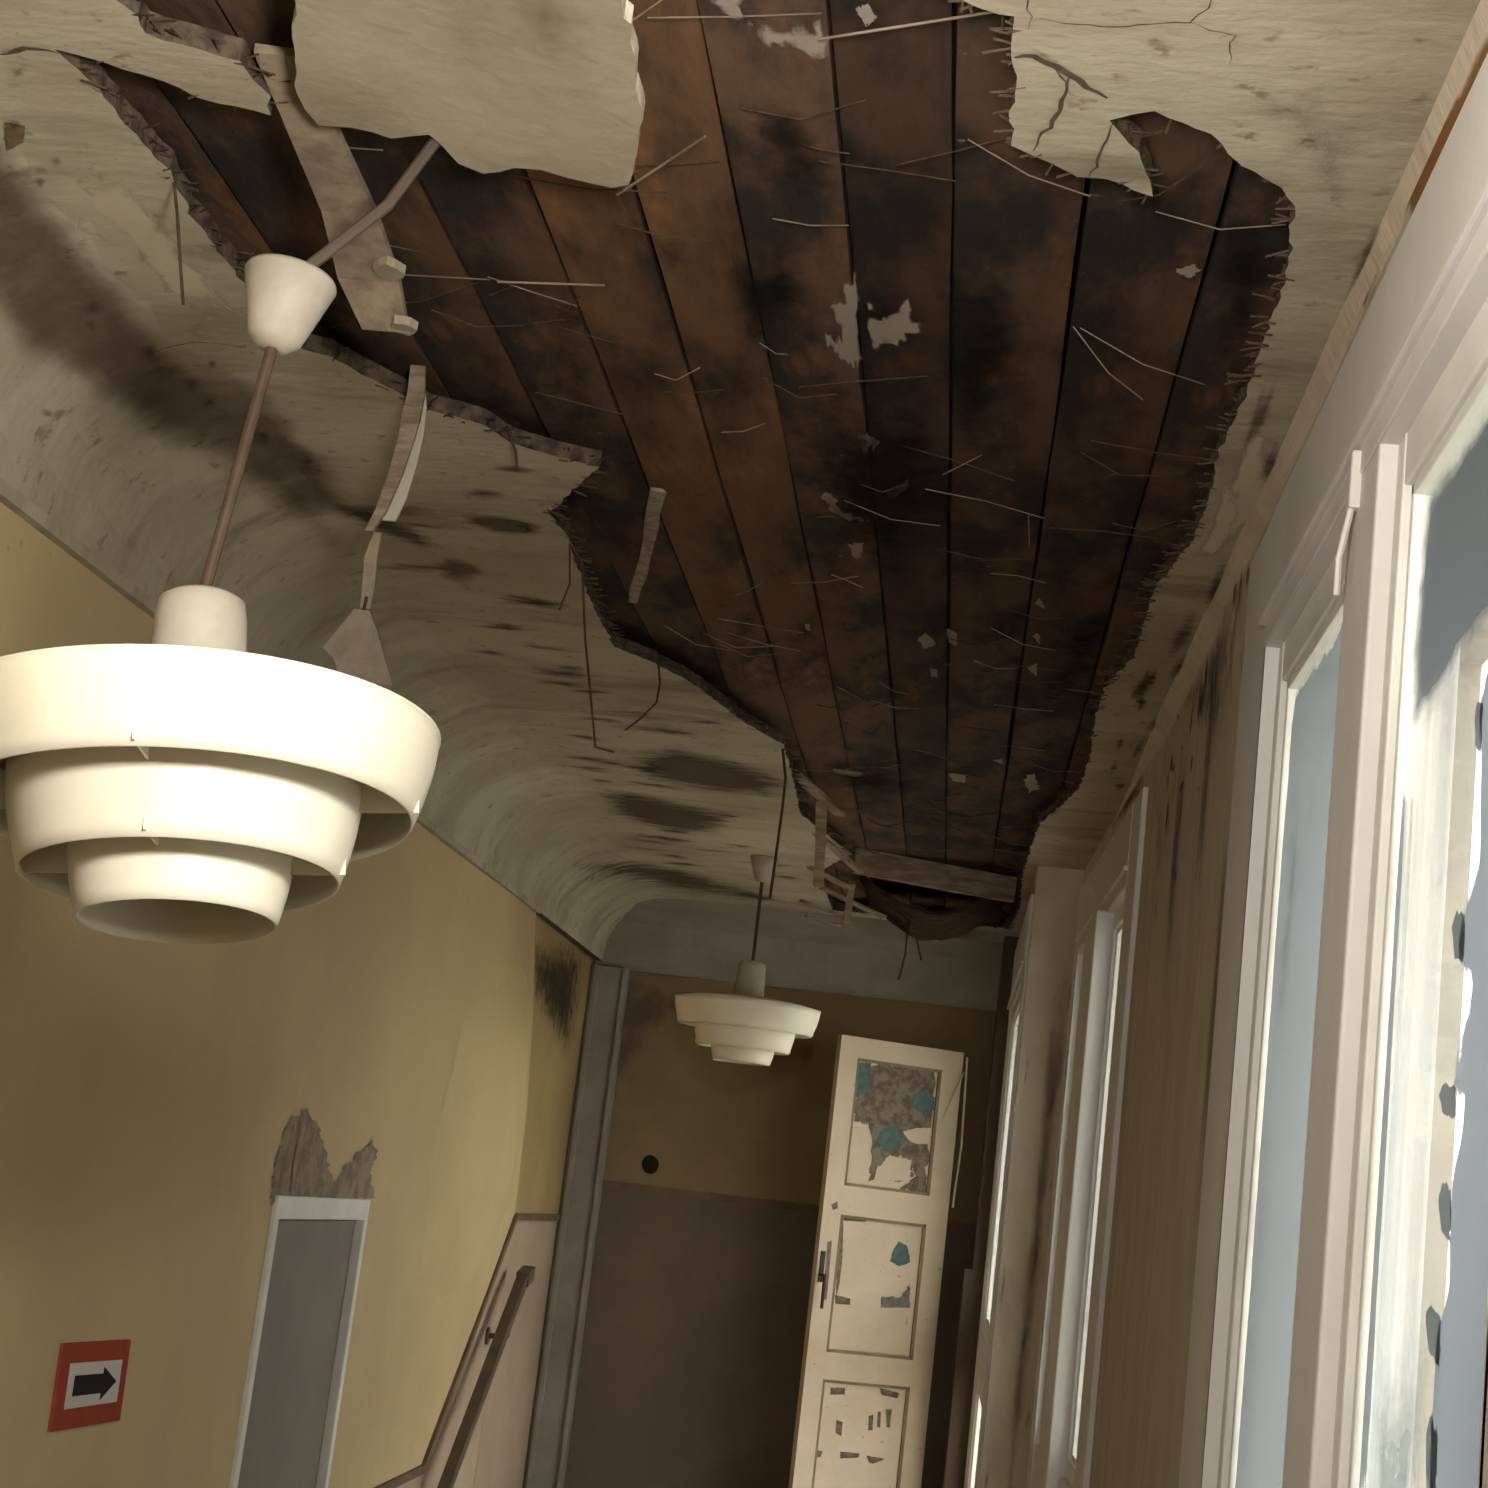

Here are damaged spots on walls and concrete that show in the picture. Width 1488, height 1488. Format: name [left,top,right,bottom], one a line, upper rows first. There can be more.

crack [1014,0,1236,180]
water stain [1355,243,1374,279]
water stain [0,170,433,545]
water stain [420,562,477,579]
water stain [471,518,532,533]
spalling [66,0,1295,941]
water stain [1190,557,1253,730]
water stain [571,721,779,900]
water stain [1111,757,1192,877]
water stain [535,952,578,1038]
spalling [269,1108,378,1206]
peeling [848,1062,936,1192]